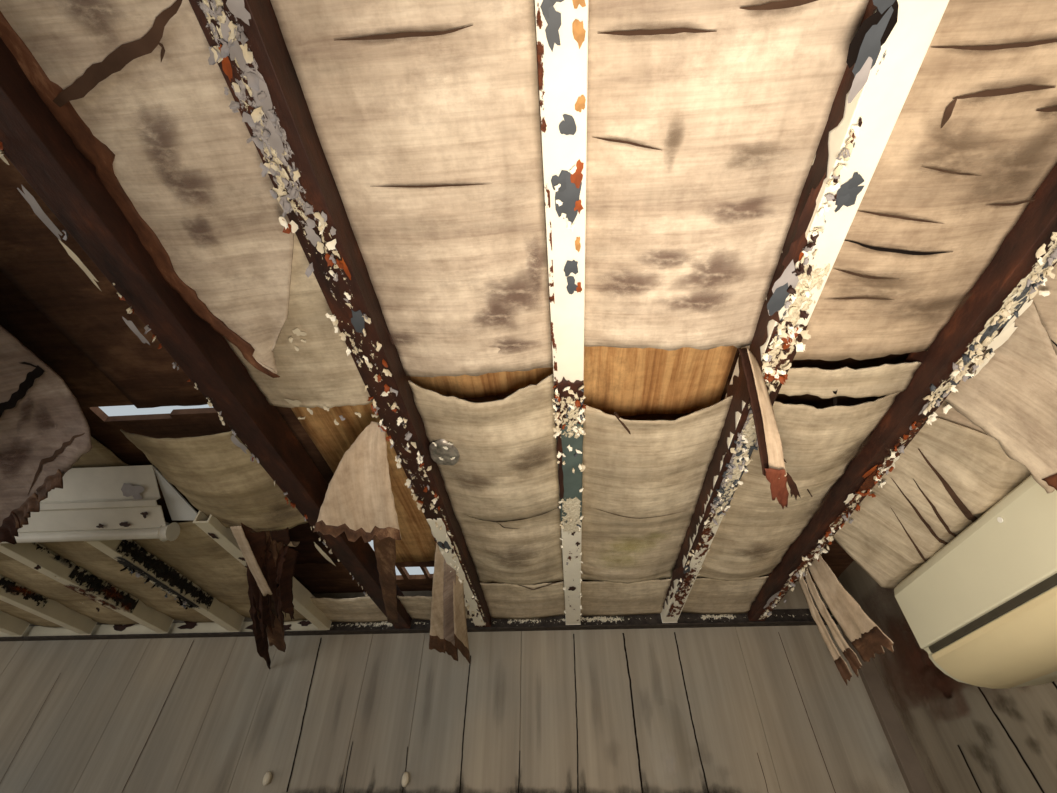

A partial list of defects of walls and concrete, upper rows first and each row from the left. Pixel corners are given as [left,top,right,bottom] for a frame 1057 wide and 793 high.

peeling [846,0,899,103]
crack [941,83,1057,128]
peeling [17,184,100,289]
peeling [113,283,162,349]
peeling [198,0,651,626]
peeling [760,117,864,407]
peeling [187,379,259,464]
peeling [759,232,1057,620]
peeling [667,398,758,619]
crack [890,449,978,562]
corrosion [0,577,48,608]
corrosion [34,543,139,631]